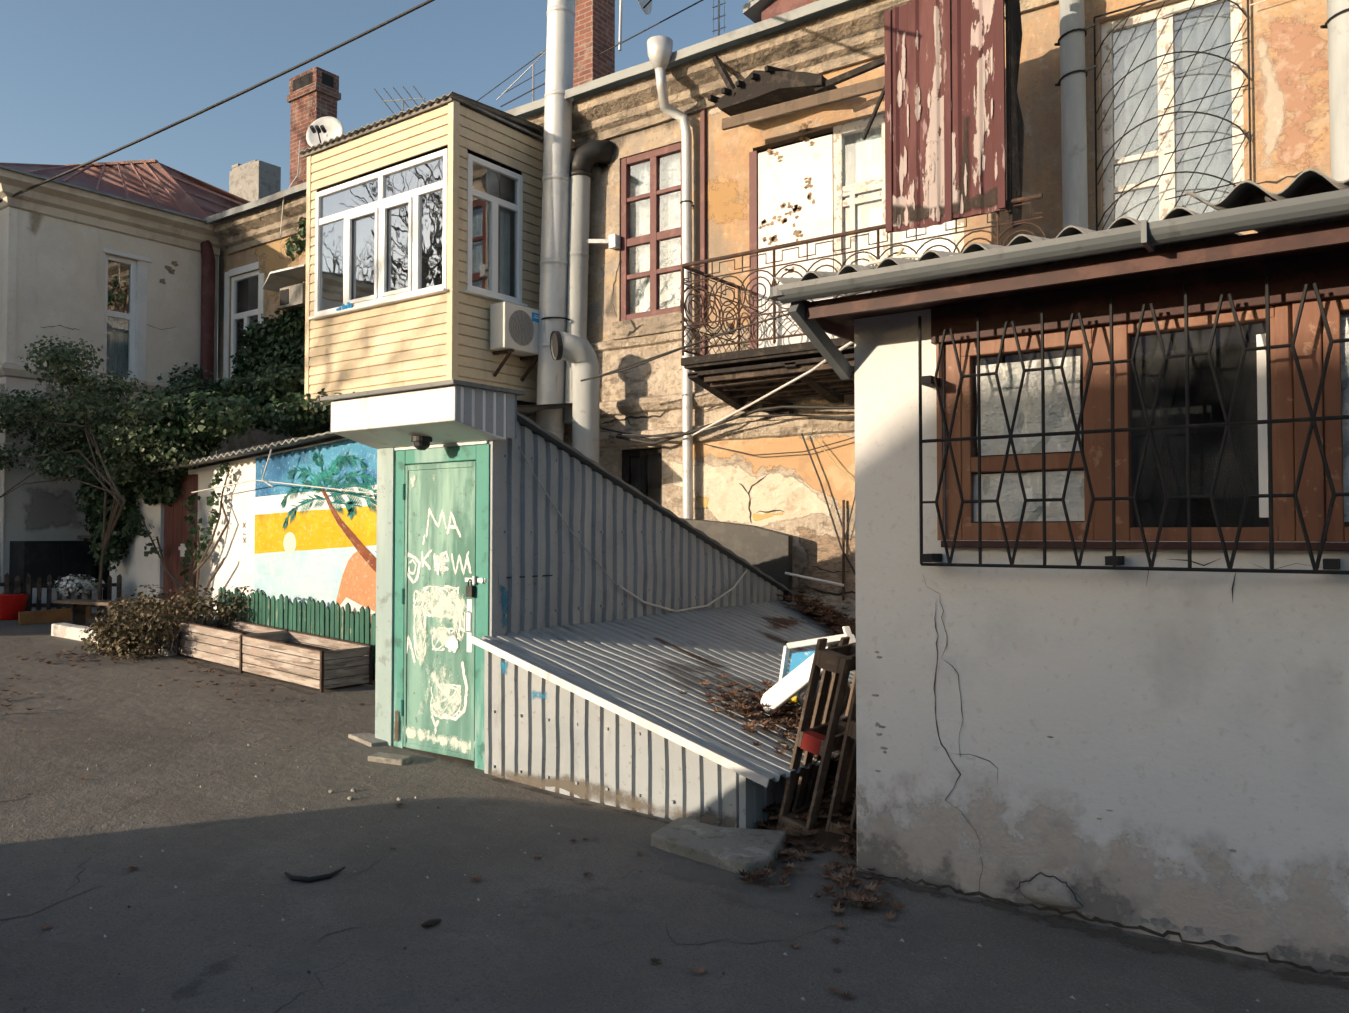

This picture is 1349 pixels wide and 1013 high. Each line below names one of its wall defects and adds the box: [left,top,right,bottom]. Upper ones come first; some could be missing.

peeling [891,0,998,229]
spalling [762,402,794,414]
flaking render [25,489,81,530]
flaking render [672,434,856,600]
crack [860,576,1349,976]
leakage [857,834,961,894]
leakage [1272,947,1349,979]